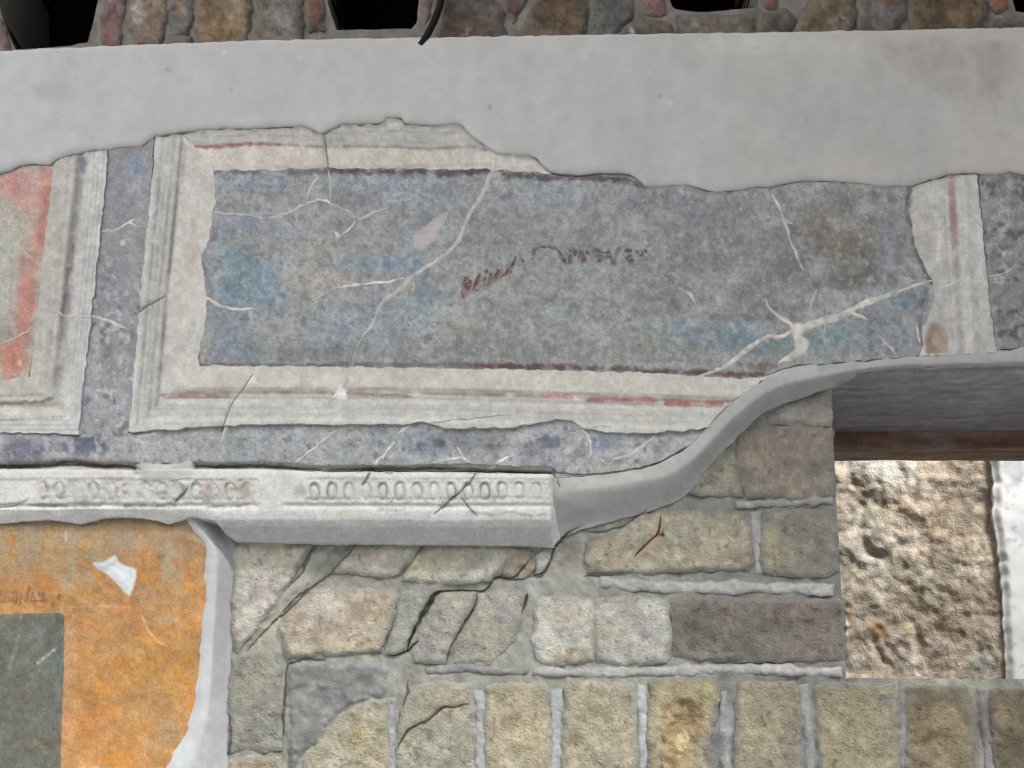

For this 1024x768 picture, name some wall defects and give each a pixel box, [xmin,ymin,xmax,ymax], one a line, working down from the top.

crack [212,134,390,246]
crack [205,296,257,311]
crack [285,158,497,465]
crack [693,194,1024,378]
crack [219,375,252,446]
crack [420,446,514,516]
flaking render [92,554,137,597]
crack [378,512,665,662]
crack [395,681,469,752]